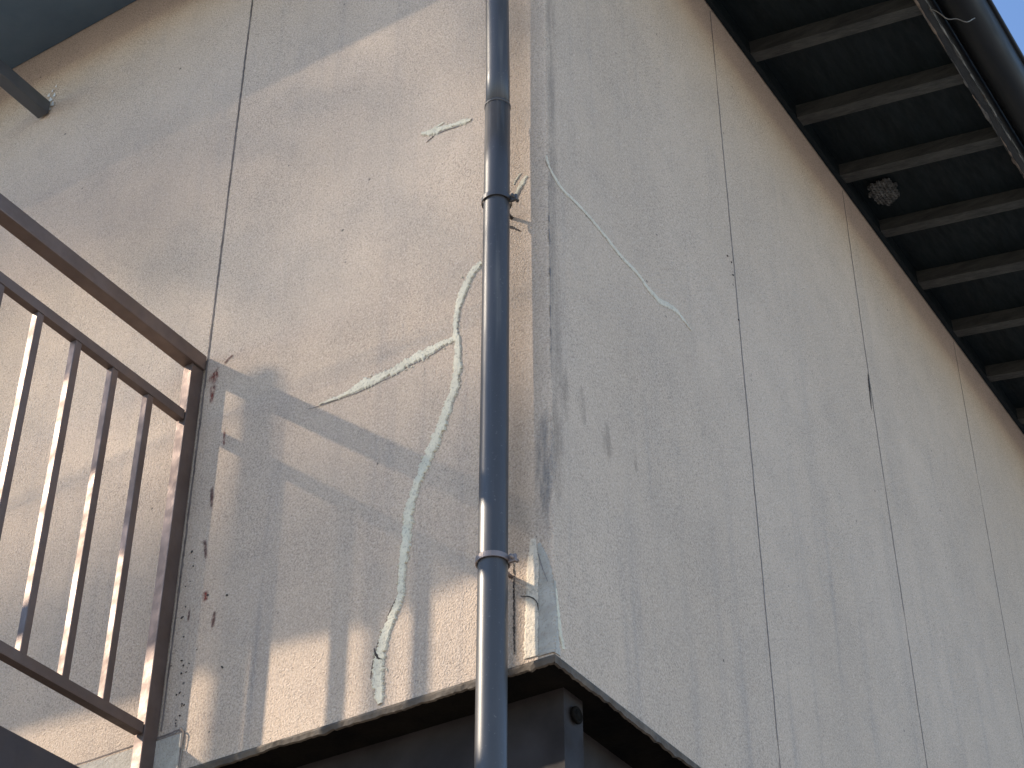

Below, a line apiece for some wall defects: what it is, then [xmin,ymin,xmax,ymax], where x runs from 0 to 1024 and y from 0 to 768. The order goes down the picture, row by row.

crack [421,118,471,143]
crack [546,268,554,362]
crack [512,155,692,331]
crack [309,261,482,704]